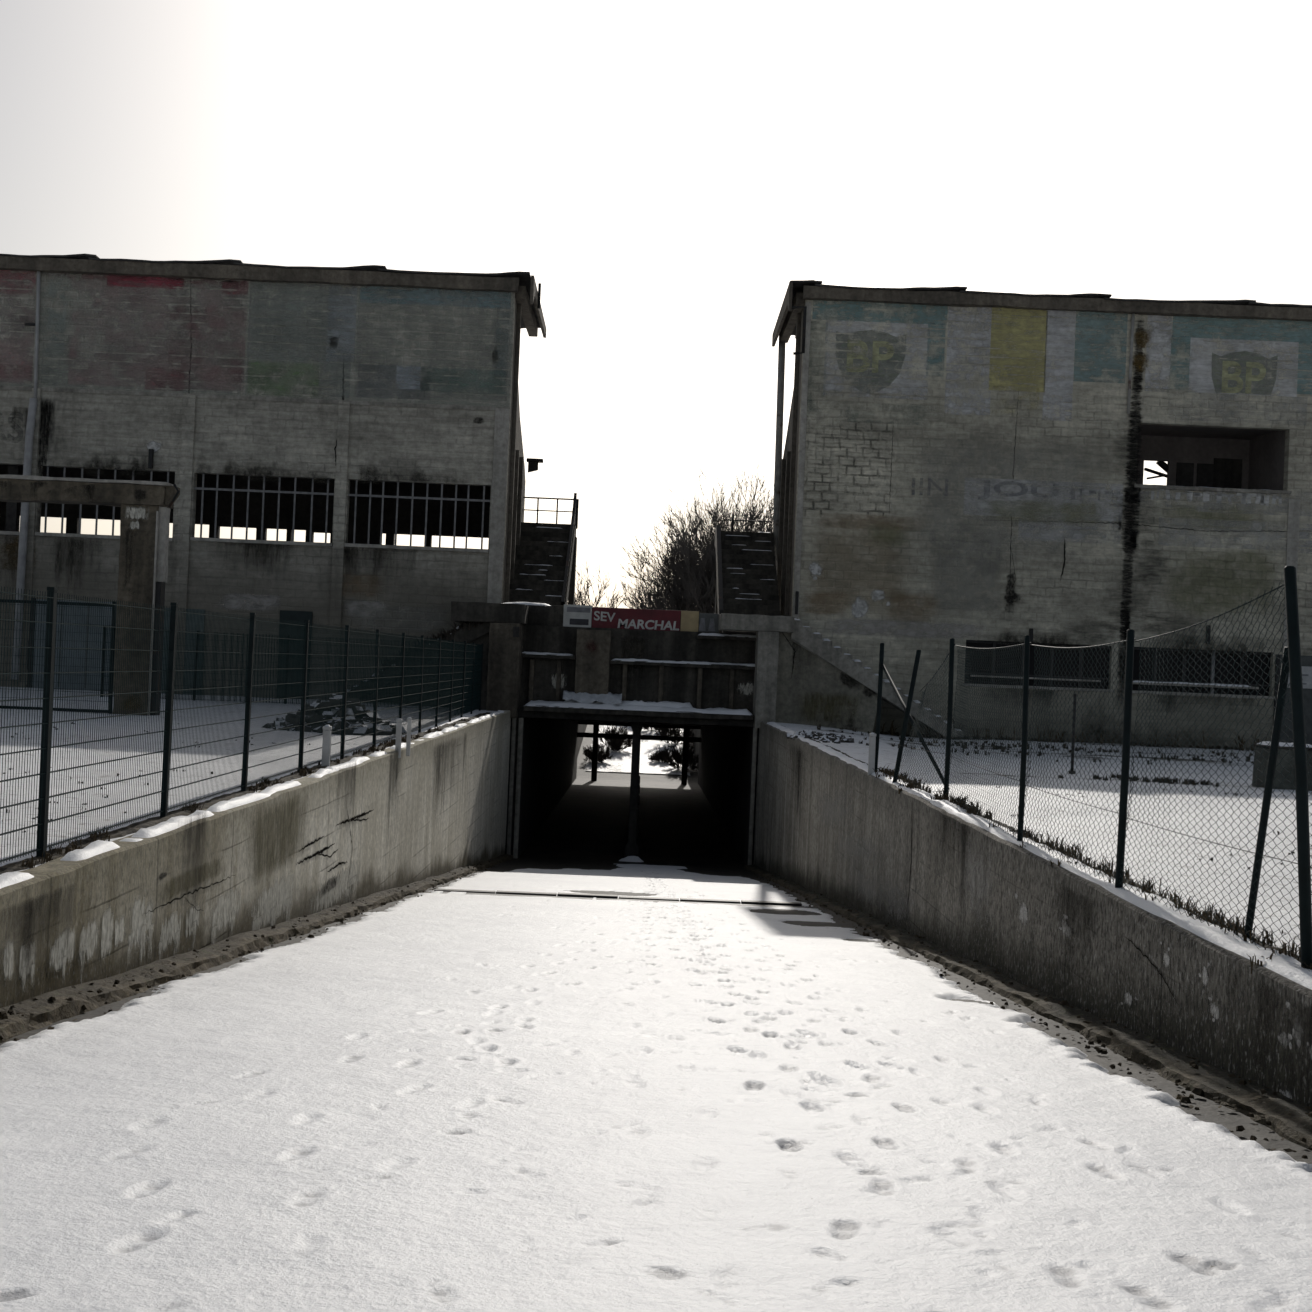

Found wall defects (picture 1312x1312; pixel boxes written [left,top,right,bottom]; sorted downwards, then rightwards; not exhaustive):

water stain [1118,320,1143,696]
crack [297,810,373,888]